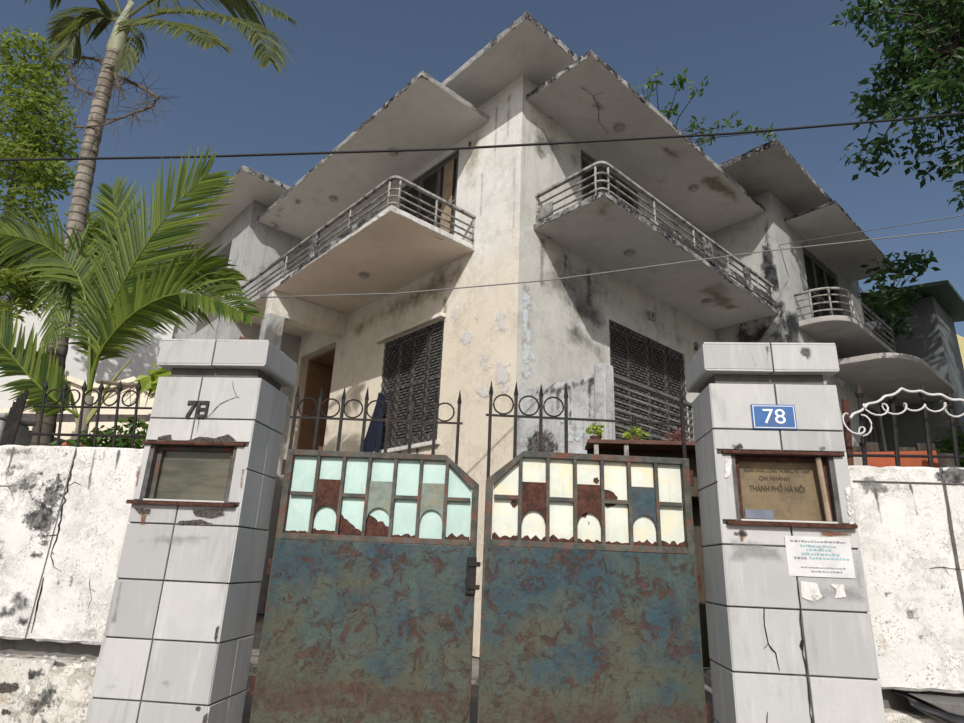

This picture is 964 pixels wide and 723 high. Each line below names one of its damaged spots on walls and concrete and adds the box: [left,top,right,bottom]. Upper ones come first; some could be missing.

leakage [554,255,600,323]
leakage [737,226,810,358]
leakage [525,427,558,452]
leakage [1,447,72,558]
leakage [936,466,964,485]
crack [31,449,80,632]
crack [763,608,780,671]
crack [797,585,813,723]
leakage [28,668,63,723]